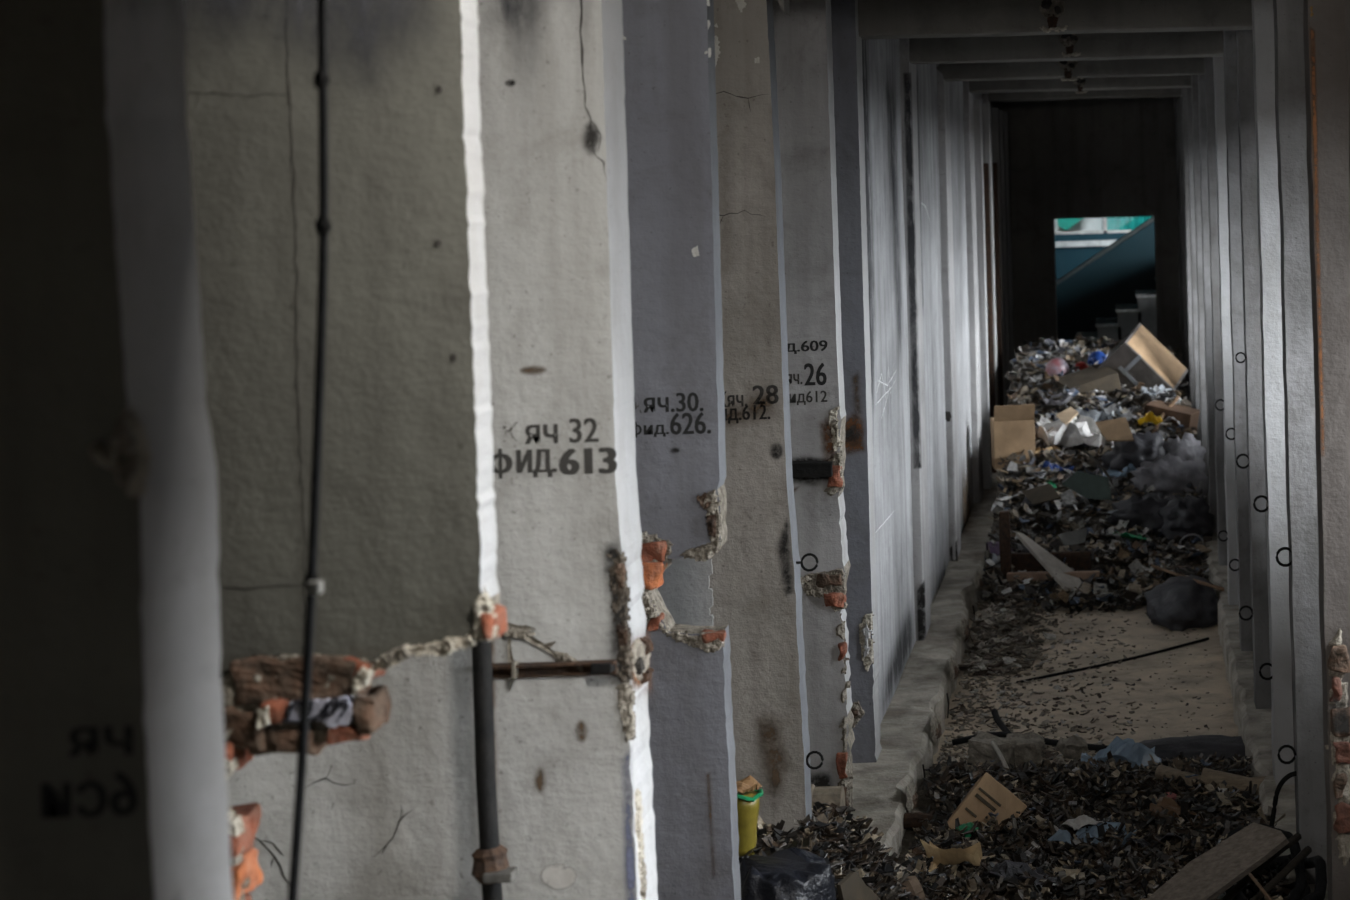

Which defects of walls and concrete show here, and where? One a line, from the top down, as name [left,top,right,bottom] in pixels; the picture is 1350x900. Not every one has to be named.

flaking render [824,406,844,496]
flaking render [228,802,263,900]
flaking render [221,586,536,781]
flaking render [606,489,726,742]
flaking render [801,568,875,816]
flaking render [1325,628,1350,866]